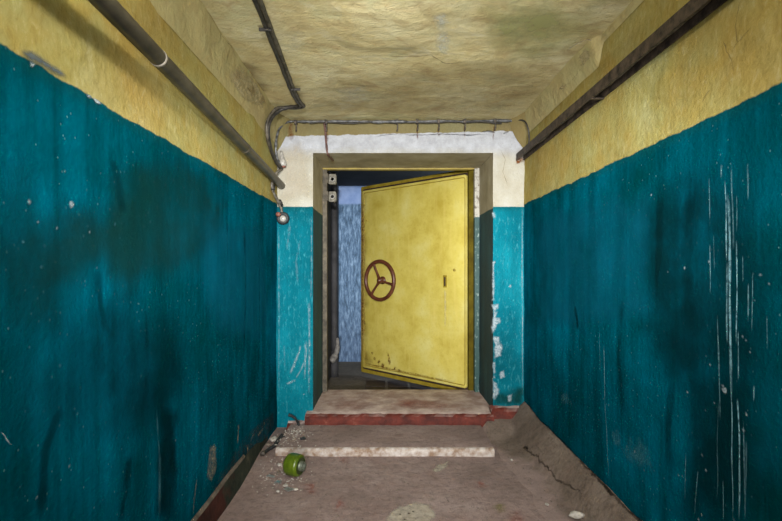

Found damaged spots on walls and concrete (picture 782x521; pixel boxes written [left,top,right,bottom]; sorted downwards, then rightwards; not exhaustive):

peeling [492,305,504,397]
crack [528,405,643,521]